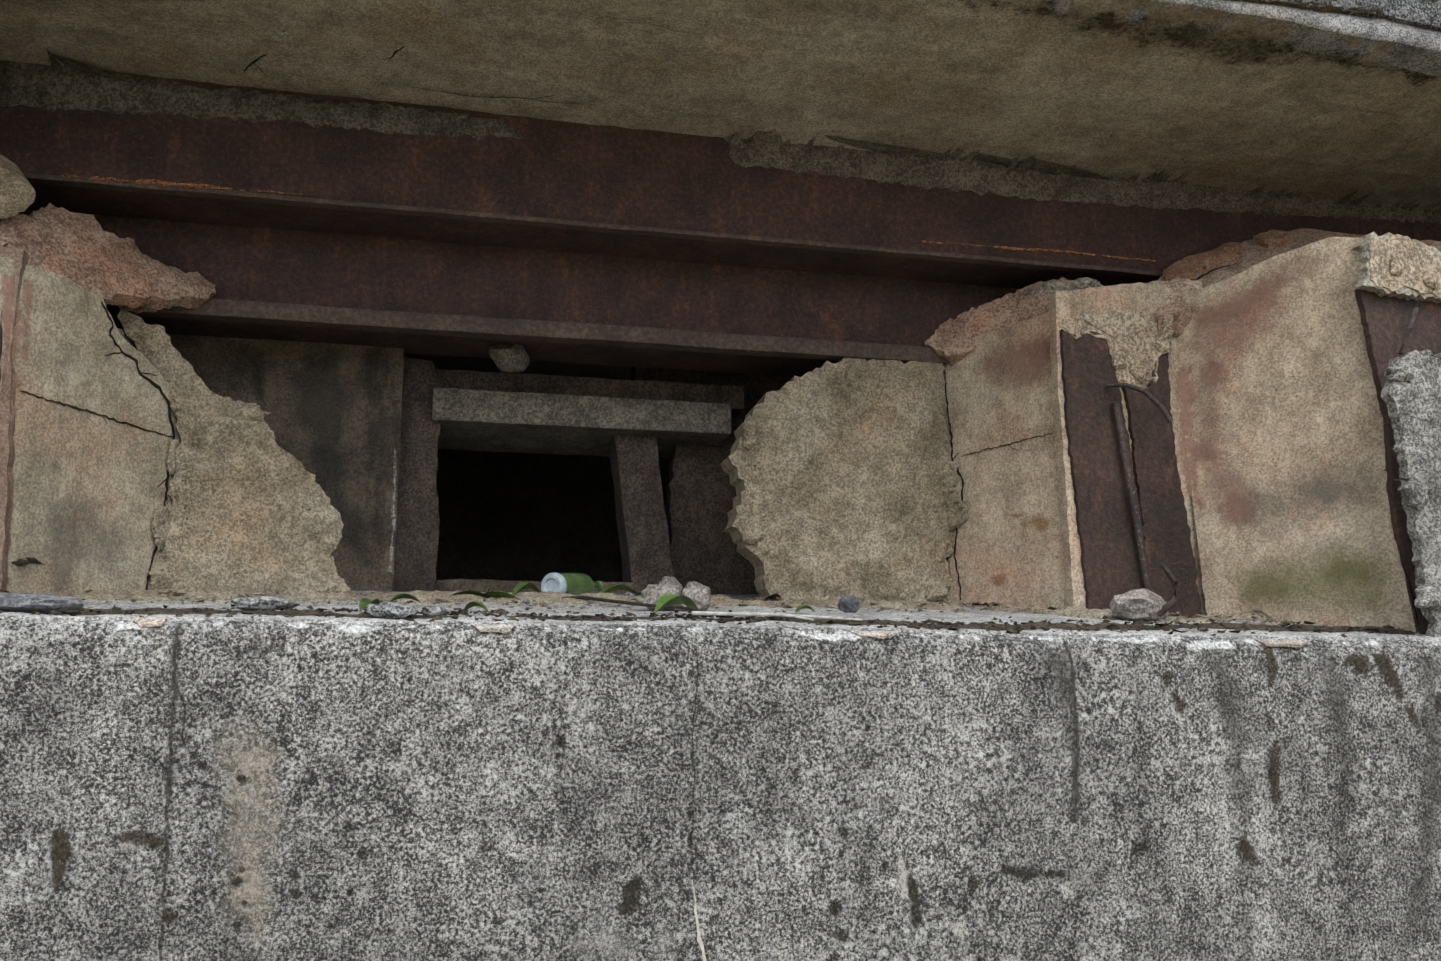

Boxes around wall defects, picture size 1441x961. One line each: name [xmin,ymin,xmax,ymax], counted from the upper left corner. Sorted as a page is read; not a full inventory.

spalling [0,49,524,141]
spalling [0,203,216,314]
corrosion [62,173,303,195]
corrosion [922,240,1155,262]
spalling [724,129,1441,302]
peeling [1058,309,1174,387]
crack [20,302,175,506]
spalling [12,557,45,566]
crack [146,546,158,590]